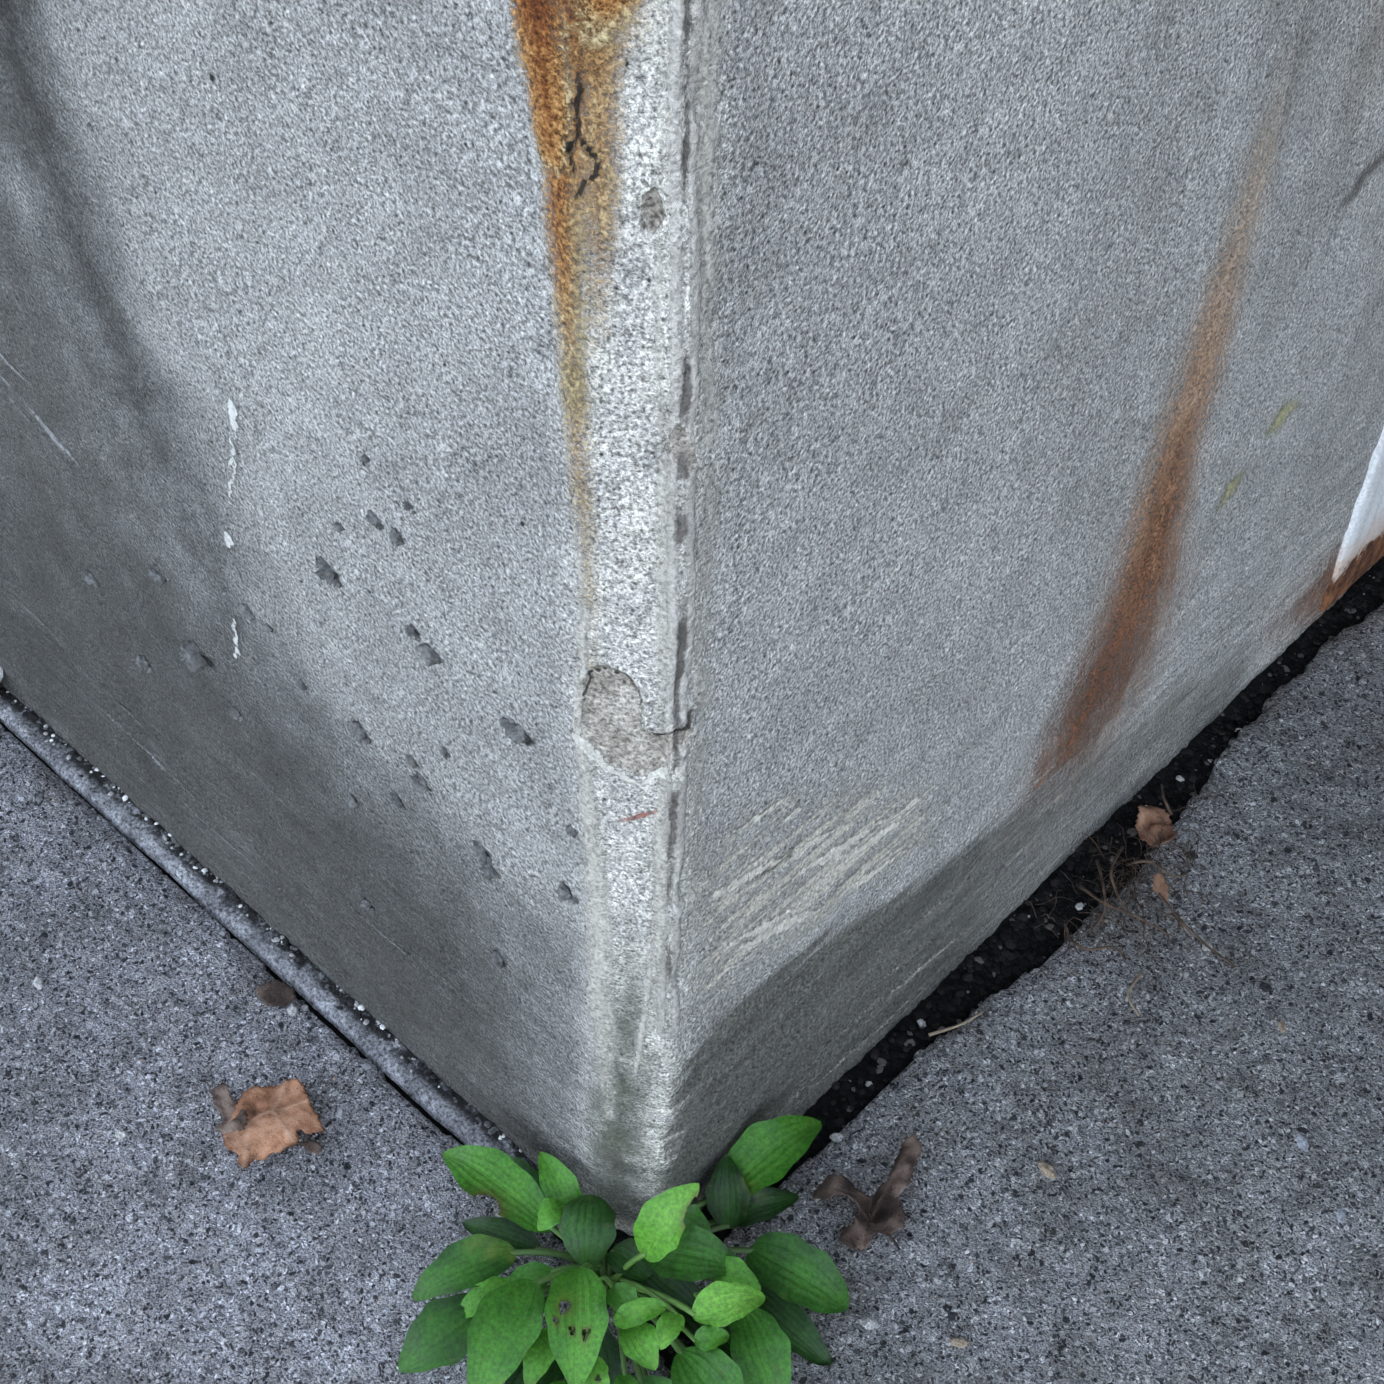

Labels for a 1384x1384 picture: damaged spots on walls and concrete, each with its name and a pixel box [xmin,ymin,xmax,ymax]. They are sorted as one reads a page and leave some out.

corrosion [510,0,640,605]
crack [565,72,601,200]
spalling [572,666,694,786]
crack [656,0,705,1039]
corrosion [1034,136,1271,789]